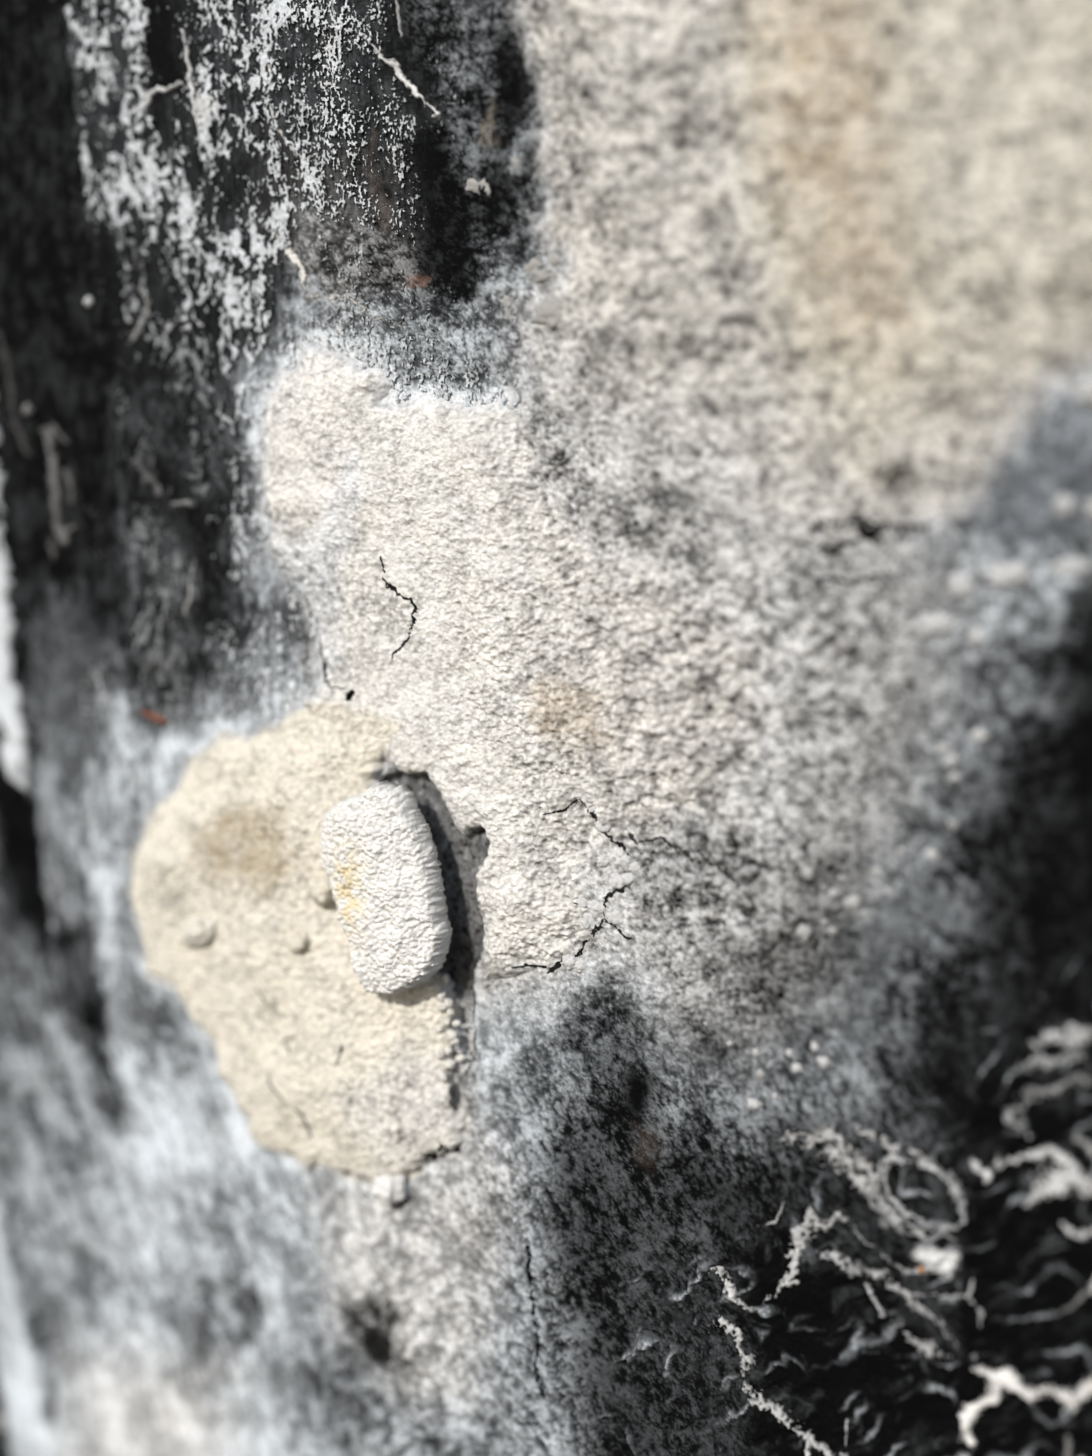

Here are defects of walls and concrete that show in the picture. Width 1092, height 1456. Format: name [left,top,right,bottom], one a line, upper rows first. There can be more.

crack [795,508,949,587]
crack [379,556,418,660]
crack [374,767,740,1073]